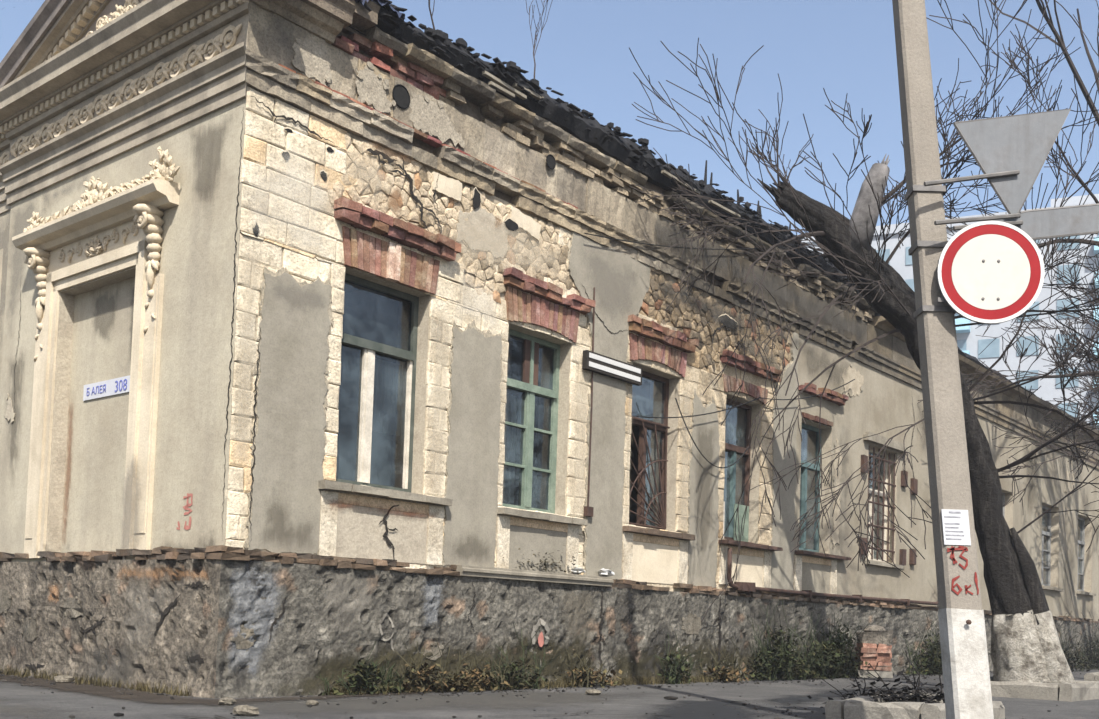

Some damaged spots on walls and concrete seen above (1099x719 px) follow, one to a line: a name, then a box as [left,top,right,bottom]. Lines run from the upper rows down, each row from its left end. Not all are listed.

crack [367,148,442,234]
spalling [320,133,580,304]
spalling [639,266,793,374]
crack [379,505,399,560]